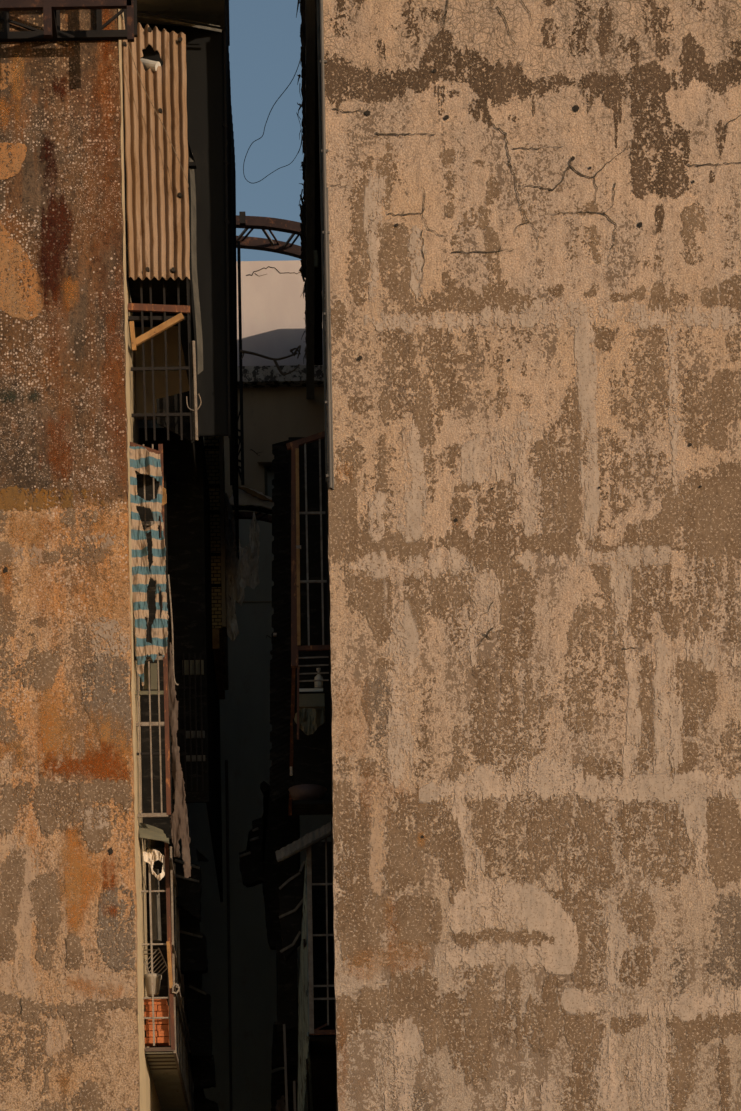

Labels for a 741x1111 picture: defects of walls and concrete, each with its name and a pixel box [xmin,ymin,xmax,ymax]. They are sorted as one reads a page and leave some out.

crack [429,0,448,44]
crack [497,0,532,45]
corrosion [36,139,77,310]
crack [388,124,627,297]
corrosion [38,690,132,780]